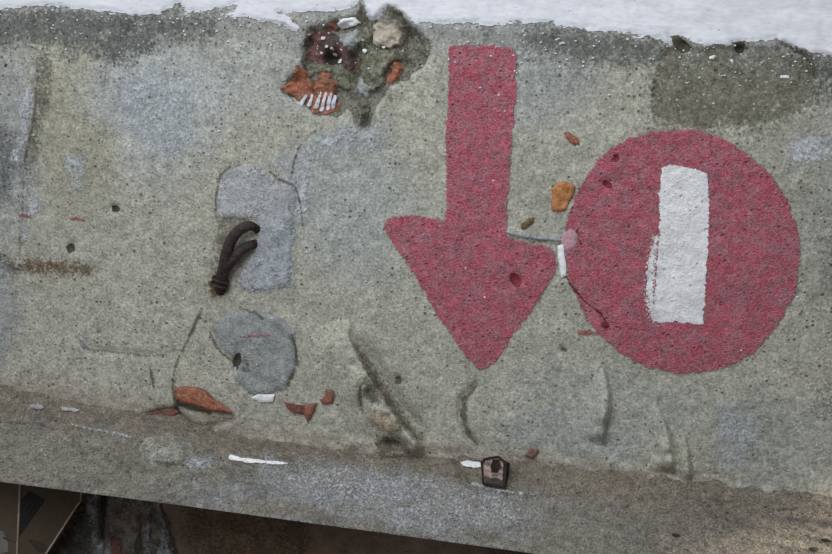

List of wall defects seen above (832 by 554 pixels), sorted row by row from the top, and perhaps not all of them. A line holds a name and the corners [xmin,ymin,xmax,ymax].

spalling [280,3,431,130]
damp [516,21,832,139]
damp [786,133,832,165]
corrosion [18,256,96,280]